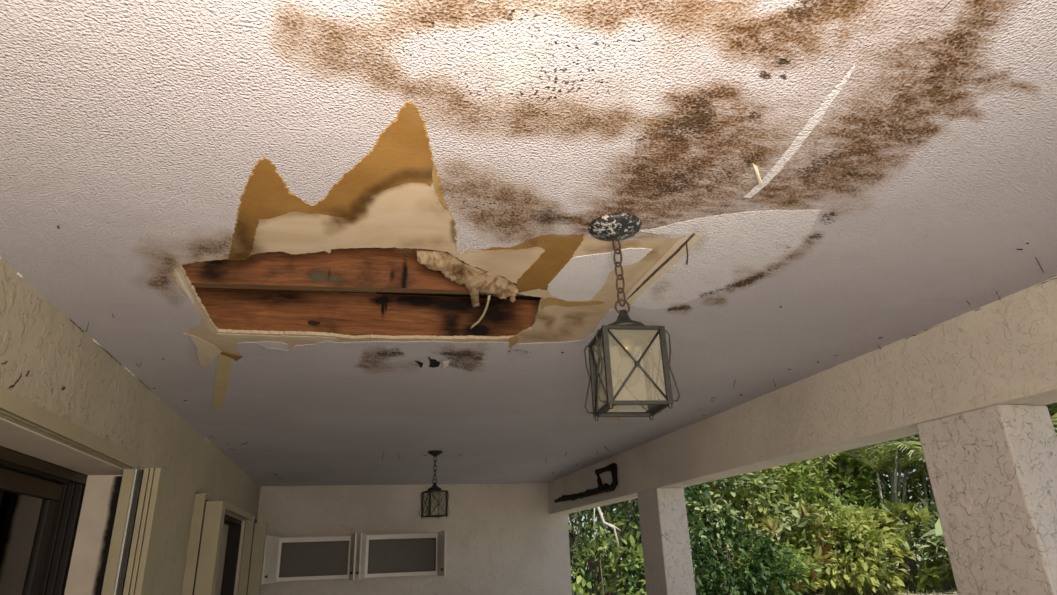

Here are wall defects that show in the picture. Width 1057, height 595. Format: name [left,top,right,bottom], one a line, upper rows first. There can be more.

water stain [280,0,1027,247]
peeling [228,101,652,311]
mould [149,253,177,290]
water stain [189,238,248,280]
mould [359,348,416,369]
water stain [373,263,514,370]
water stain [699,212,837,304]